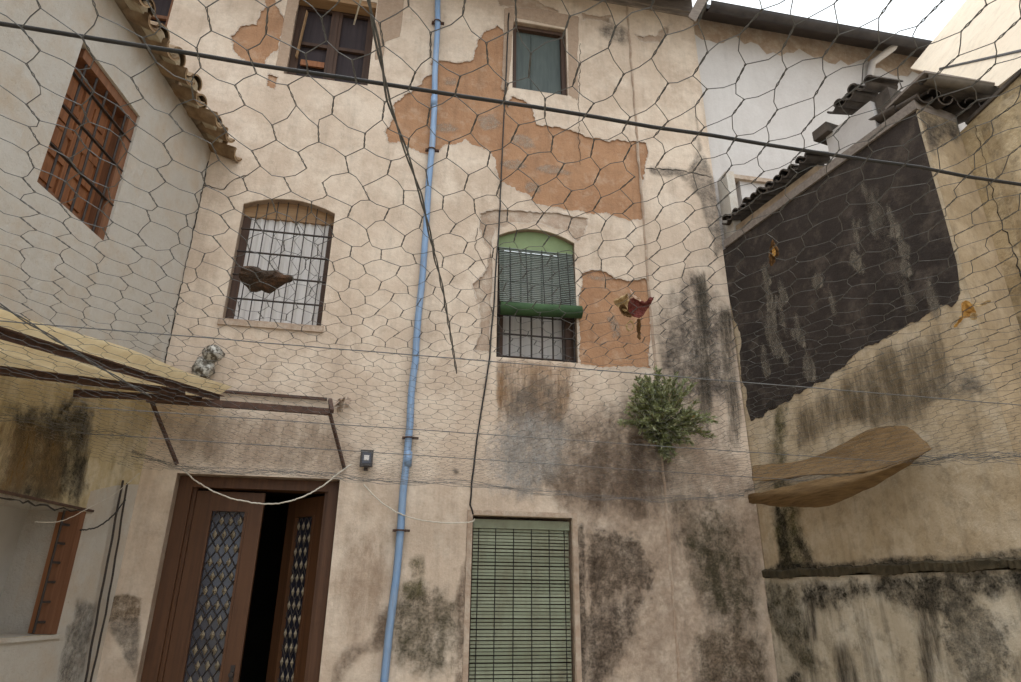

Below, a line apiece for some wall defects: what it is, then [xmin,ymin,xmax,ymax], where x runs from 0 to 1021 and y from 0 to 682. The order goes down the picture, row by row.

flaking render [230,0,299,90]
flaking render [375,0,404,59]
flaking render [383,0,649,352]
crack [975,127,1021,277]
flaking render [577,268,652,370]
leakage [662,276,738,437]
leakage [0,399,94,500]
leakage [578,525,652,682]
leakage [776,507,827,571]
leakage [802,550,1021,682]